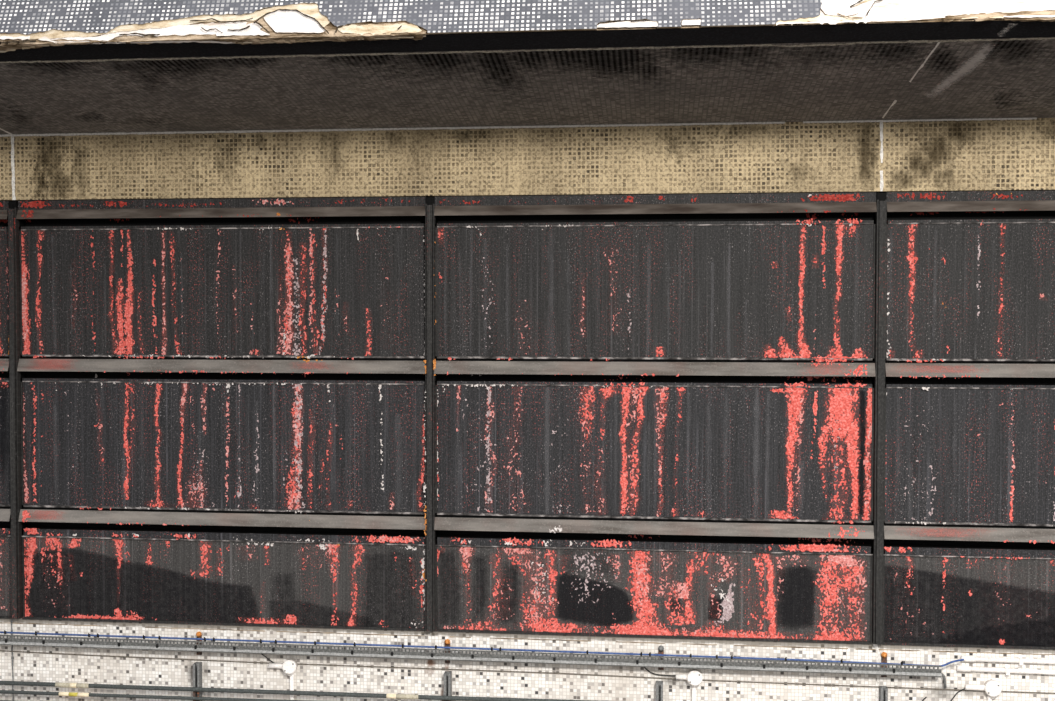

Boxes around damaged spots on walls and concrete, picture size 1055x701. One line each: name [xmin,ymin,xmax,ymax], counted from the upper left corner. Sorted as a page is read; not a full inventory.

spalling [0,3,427,53]
spalling [776,0,1055,26]
water stain [859,131,876,179]
water stain [903,127,962,185]
peeling [897,192,980,379]
peeling [0,200,275,509]
peeling [442,193,872,641]
peeling [22,382,157,620]
peeling [163,523,269,578]
peeling [238,596,297,625]
peeling [302,535,440,628]
peeling [884,547,926,635]